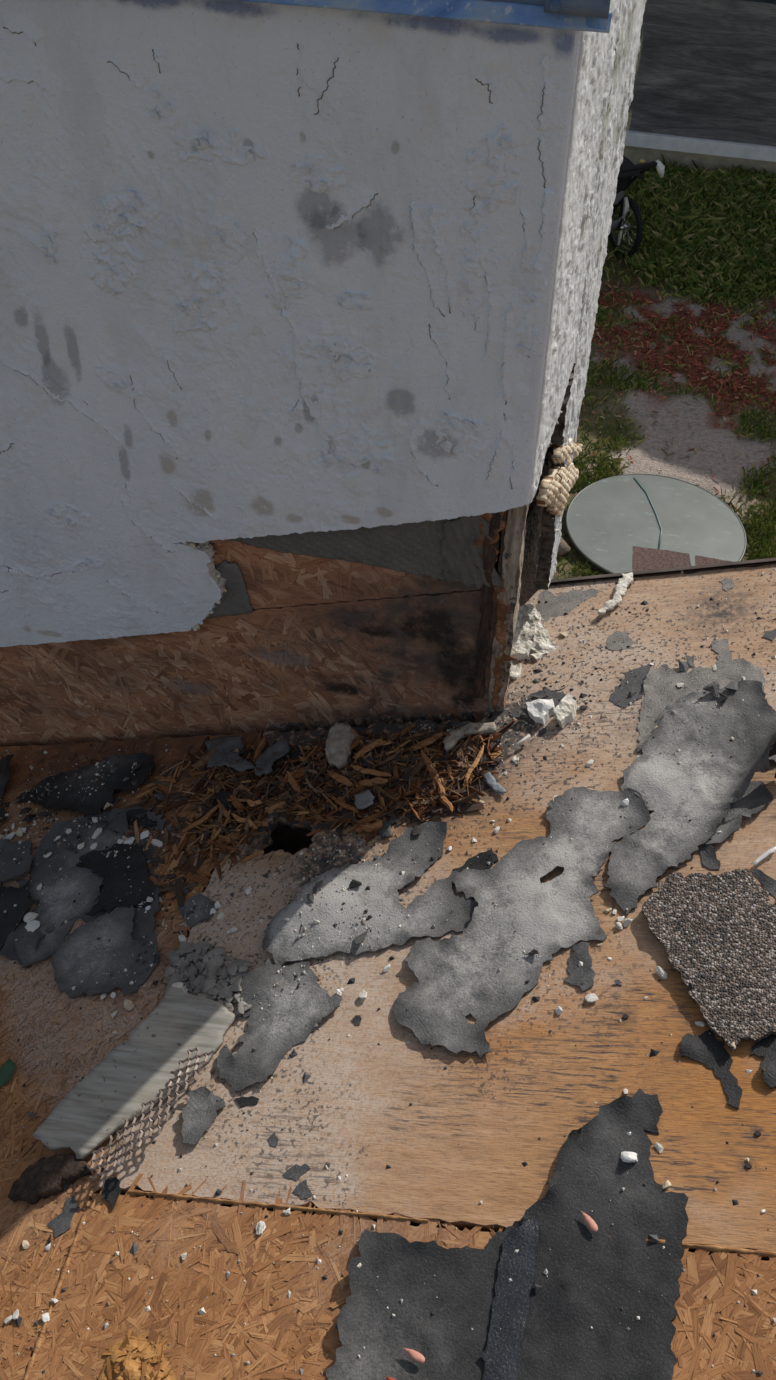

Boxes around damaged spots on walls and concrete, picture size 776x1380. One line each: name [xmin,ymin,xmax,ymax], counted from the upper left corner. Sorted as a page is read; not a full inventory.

crack [320,183,378,230]